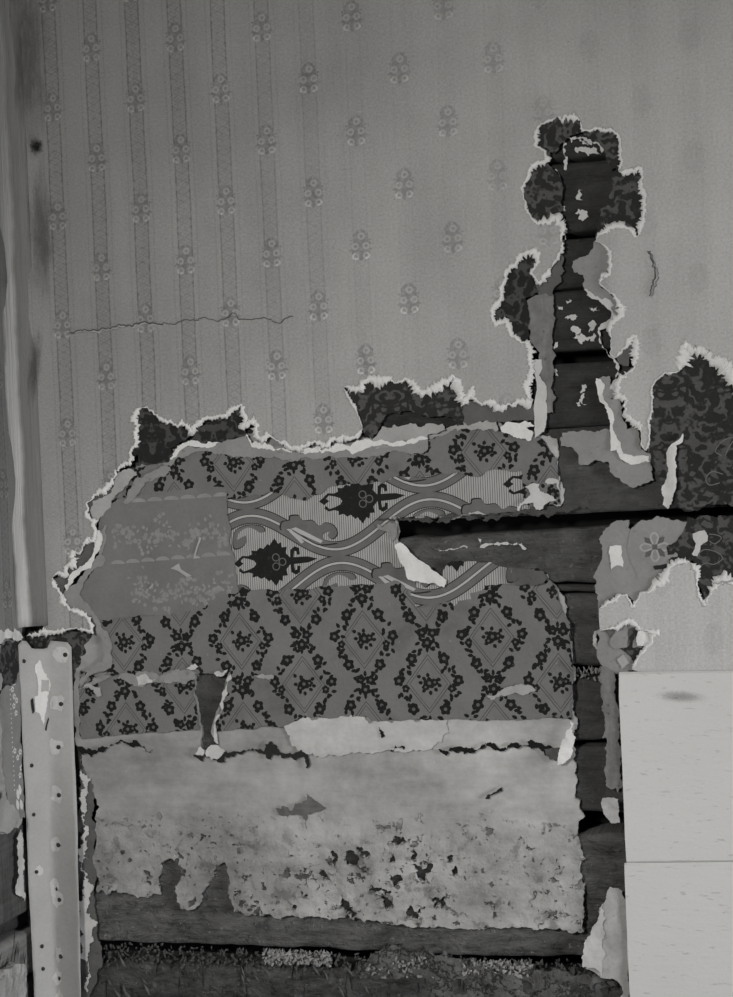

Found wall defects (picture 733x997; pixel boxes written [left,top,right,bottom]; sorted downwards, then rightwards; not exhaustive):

crack [69,312,293,335]
peeling [0,111,733,793]
peeling [276,793,326,826]
peeling [0,791,26,901]
peeling [77,756,103,997]
hole [320,847,370,881]
hole [368,836,433,911]
hole [341,899,357,921]
hole [404,897,447,925]